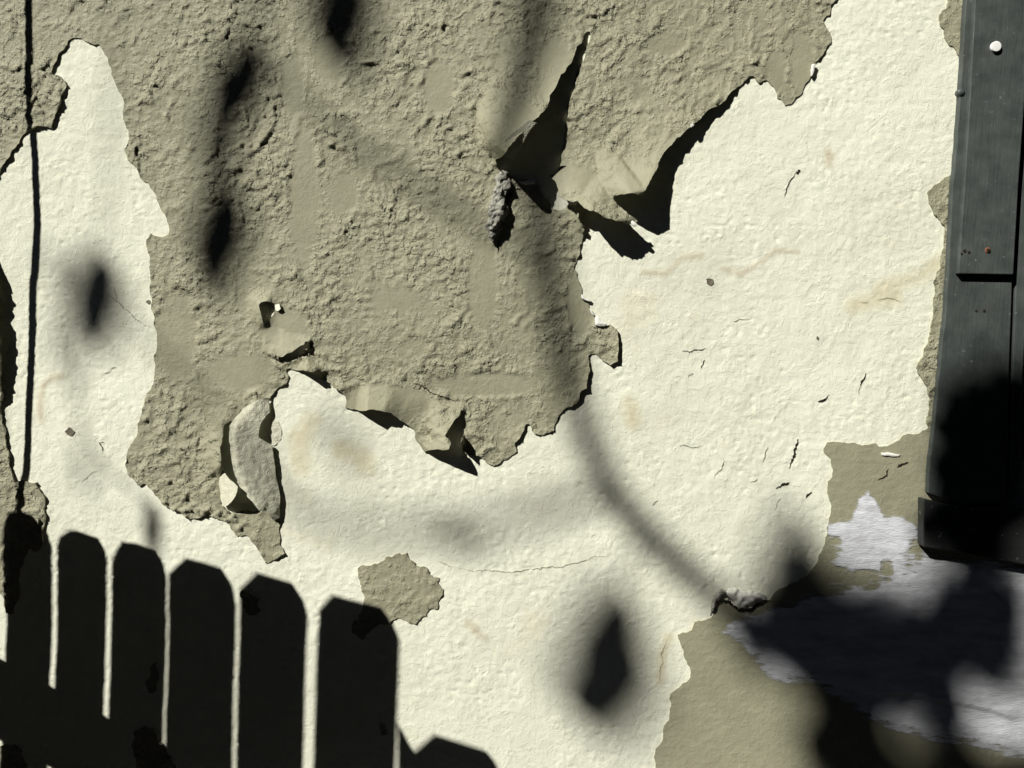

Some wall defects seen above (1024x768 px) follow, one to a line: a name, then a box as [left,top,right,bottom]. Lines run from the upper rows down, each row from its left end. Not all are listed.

peeling [938,0,963,56]
peeling [473,8,590,210]
peeling [550,32,758,227]
peeling [259,301,314,362]
peeling [296,356,331,384]
peeling [331,368,465,451]
peeling [219,398,282,521]
peeling [240,589,261,615]
peeling [351,553,443,640]
peeling [726,587,766,610]
peeling [145,661,159,693]
peeling [0,744,27,768]